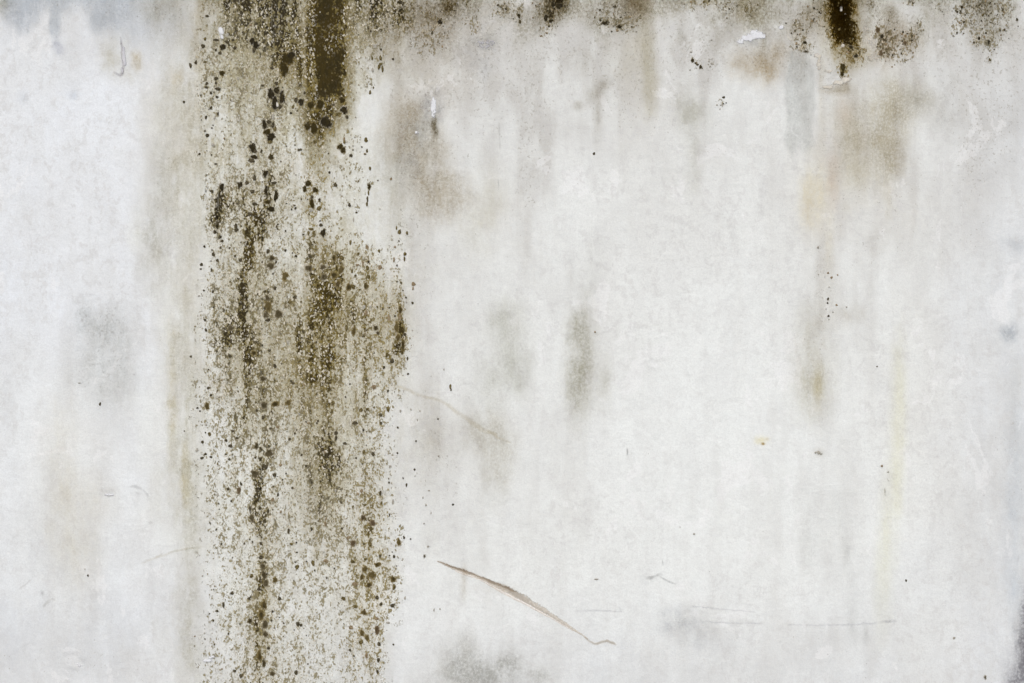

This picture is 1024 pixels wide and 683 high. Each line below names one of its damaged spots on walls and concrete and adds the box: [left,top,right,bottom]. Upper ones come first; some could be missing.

leakage [492,0,570,38]
leakage [593,0,641,35]
leakage [684,0,759,19]
leakage [785,0,863,78]
leakage [868,19,924,68]
leakage [936,0,1019,63]
leakage [184,0,479,683]
crack [437,561,588,639]